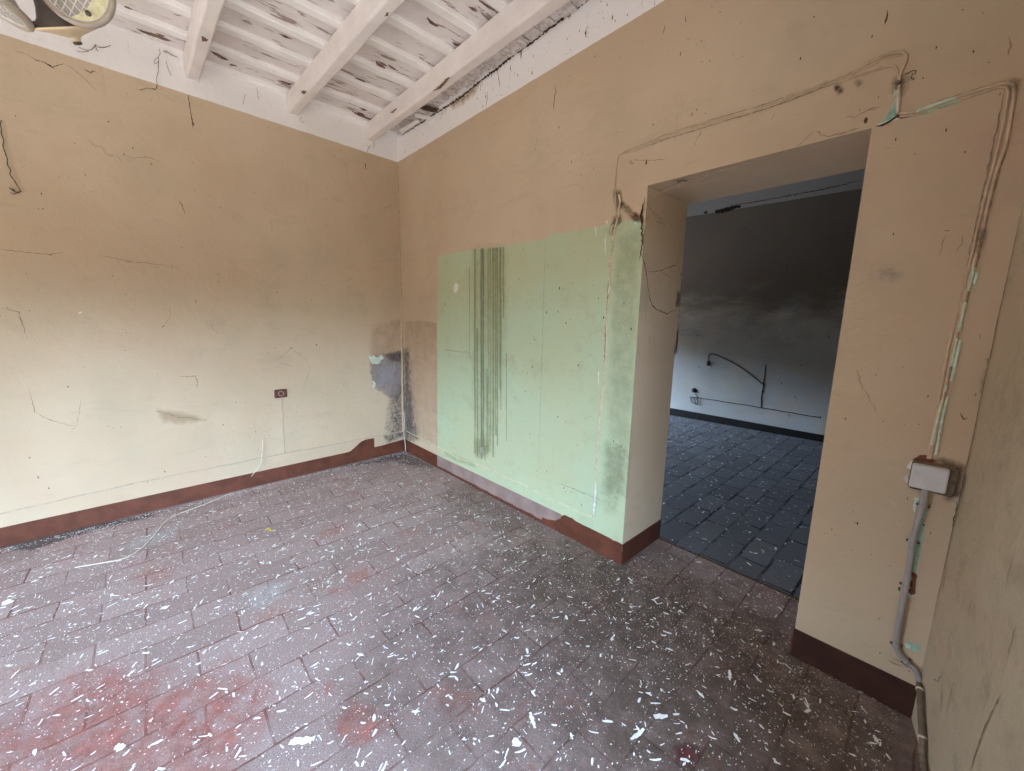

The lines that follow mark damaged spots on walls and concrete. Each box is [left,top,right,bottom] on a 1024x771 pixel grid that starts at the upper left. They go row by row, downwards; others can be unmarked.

flaking render [390,0,589,134]
crack [620,160,749,358]
peeling [0,451,571,706]
peeling [593,556,783,677]
peeling [849,691,890,770]